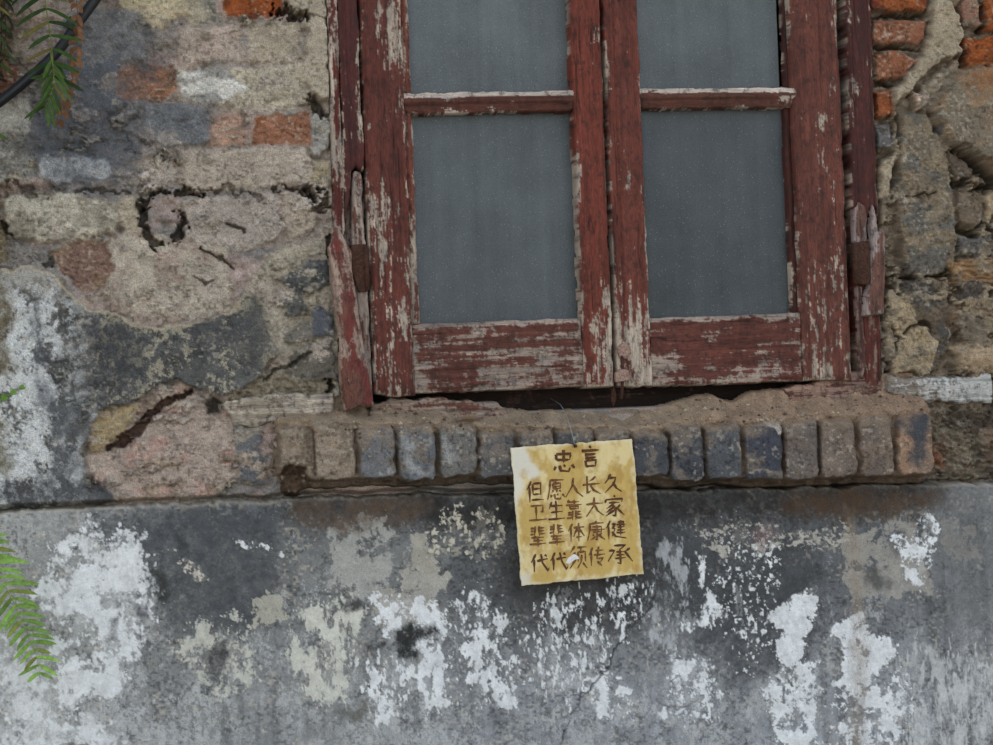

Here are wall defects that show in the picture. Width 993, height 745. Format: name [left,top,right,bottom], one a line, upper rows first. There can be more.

spalling [220,0,326,24]
spalling [0,54,24,97]
spalling [249,107,315,149]
spalling [134,184,207,253]
flaking render [0,235,850,745]
water stain [70,497,331,684]
water stain [334,593,368,615]
water stain [362,486,843,711]
crack [559,548,659,745]
water stain [331,693,378,726]
crack [653,696,700,712]